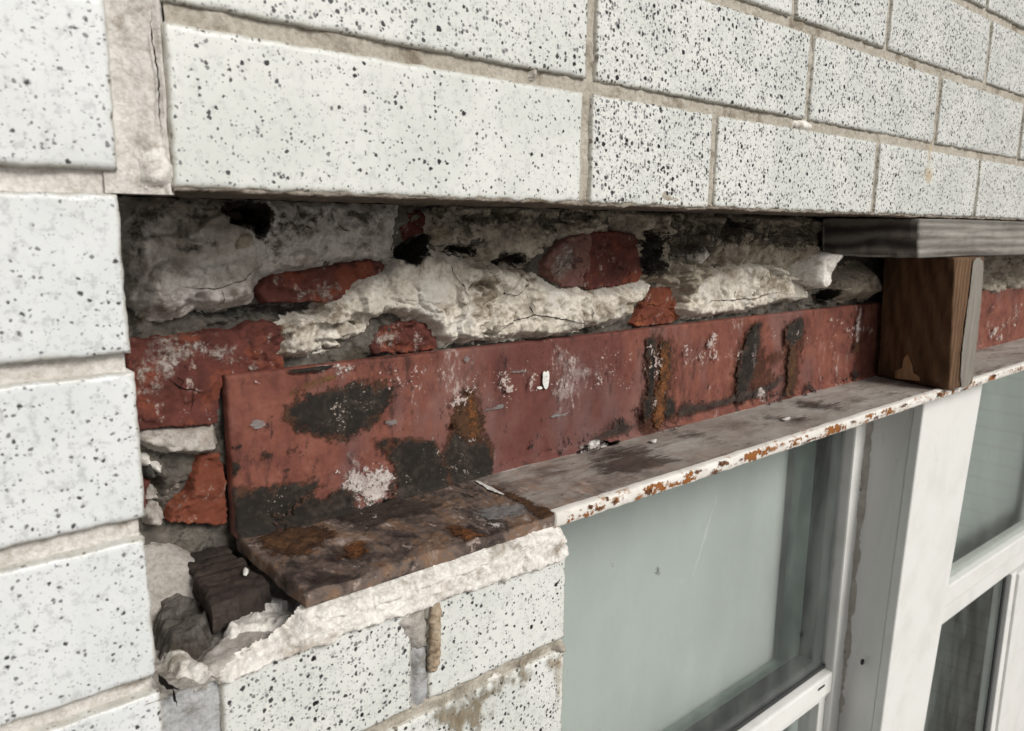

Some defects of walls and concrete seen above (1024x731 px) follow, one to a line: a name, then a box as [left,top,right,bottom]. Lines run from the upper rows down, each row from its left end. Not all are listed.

spalling [117,197,398,322]
spalling [421,192,823,303]
peeling [287,364,353,375]
corrosion [595,334,736,441]
corrosion [567,366,1024,523]
corrosion [250,525,372,591]
corrosion [445,523,494,543]
peeling [479,503,526,528]